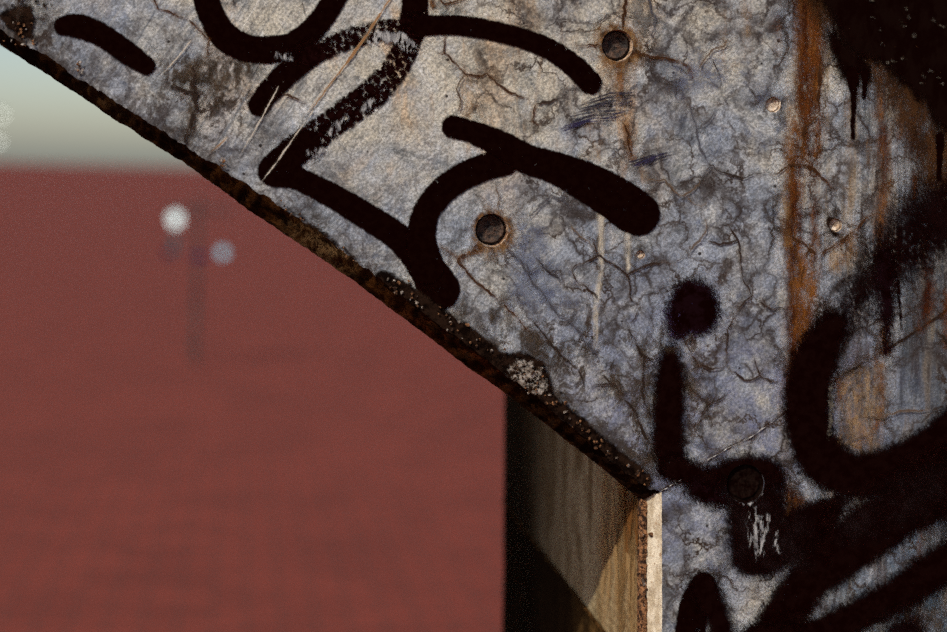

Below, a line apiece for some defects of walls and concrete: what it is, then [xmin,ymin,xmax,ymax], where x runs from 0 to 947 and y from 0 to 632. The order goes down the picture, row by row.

crack [153,0,209,143]
rust [597,24,641,92]
rust [457,210,514,263]
crack [440,0,830,442]
rust [784,0,826,378]
crack [793,214,874,280]